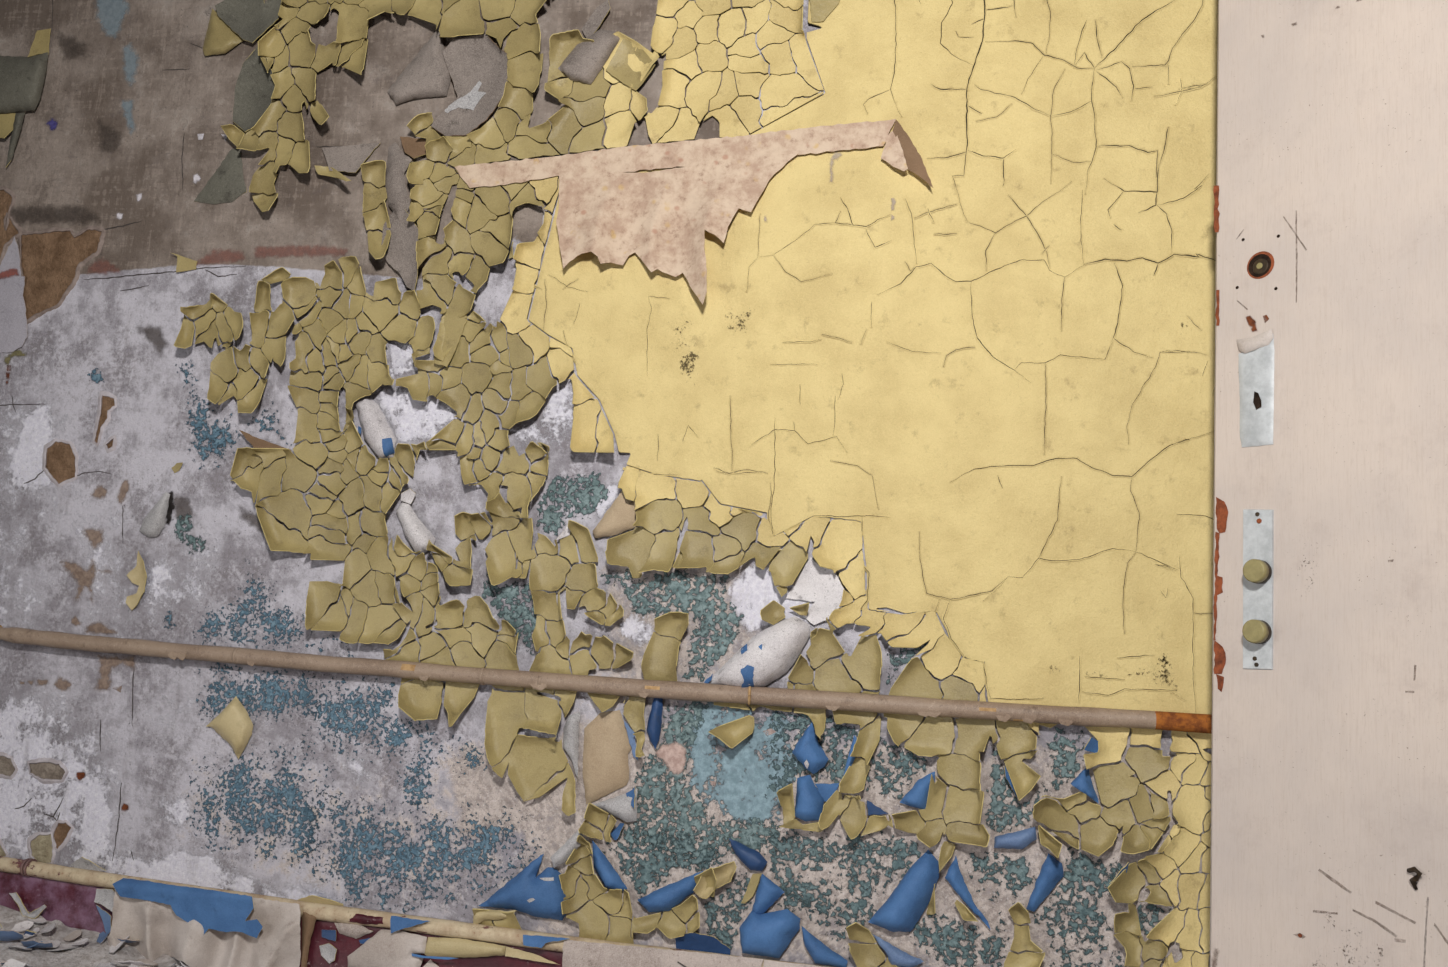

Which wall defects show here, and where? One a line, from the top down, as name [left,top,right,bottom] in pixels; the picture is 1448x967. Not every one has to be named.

spalling [0,186,105,324]
crack [534,273,589,363]
crack [623,0,1217,712]
spalling [92,391,117,453]
spalling [42,438,79,487]
peeling [174,0,1212,967]
spalling [1213,497,1228,692]
spalling [0,752,68,784]
spalling [27,820,74,864]
peeling [9,892,47,919]
peeling [94,889,115,934]